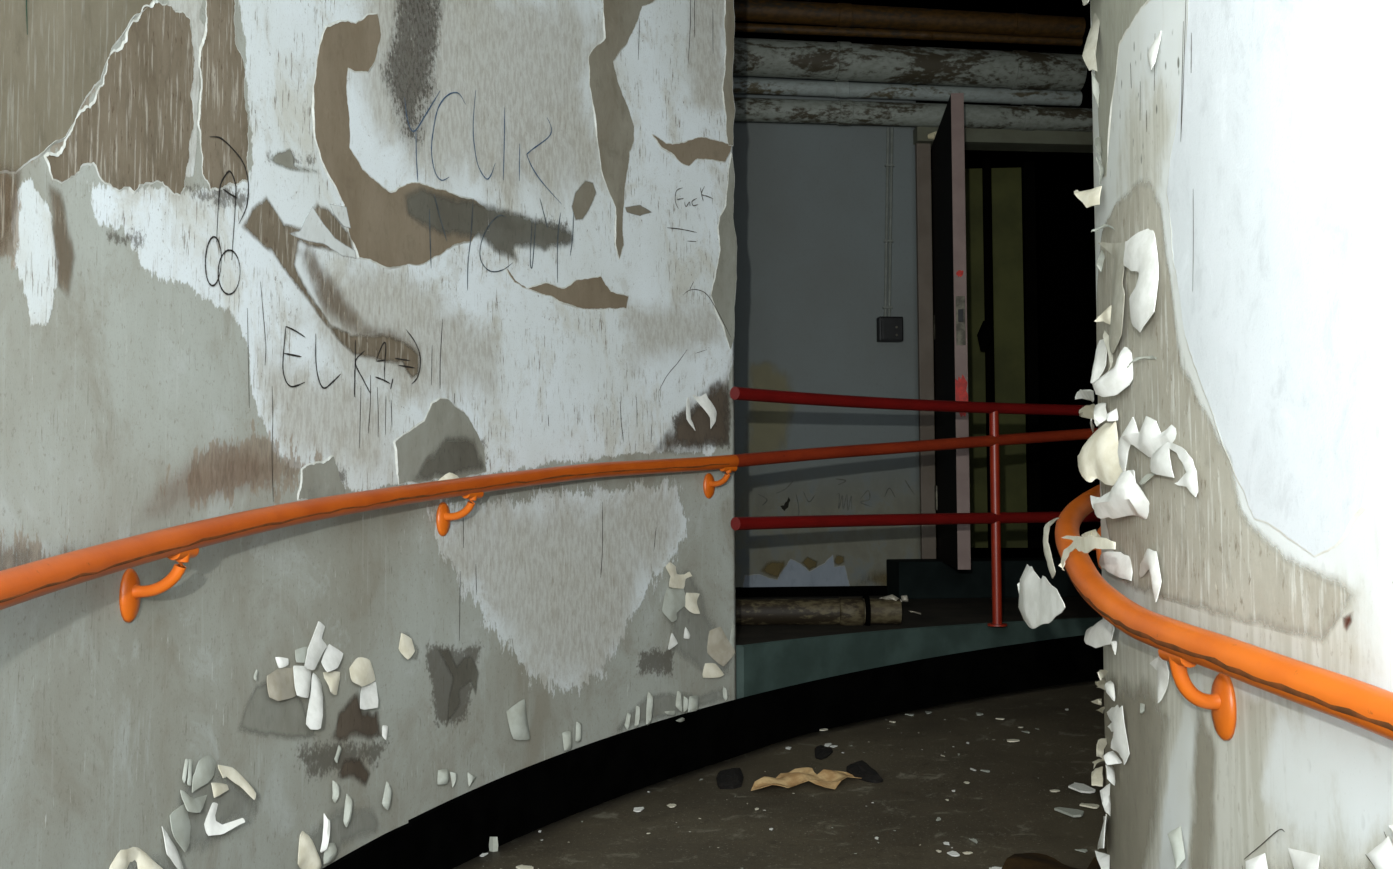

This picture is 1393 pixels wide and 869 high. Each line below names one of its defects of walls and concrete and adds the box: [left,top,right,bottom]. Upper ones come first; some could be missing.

peeling [0,0,249,197]
peeling [244,13,489,377]
peeling [504,266,629,310]
peeling [572,0,655,260]
peeling [652,0,737,350]
peeling [0,397,729,603]
peeling [1017,0,1393,869]
peeling [240,621,378,737]
peeling [399,633,418,659]
peeling [662,562,735,678]
peeling [109,755,257,869]
peeling [489,837,498,852]